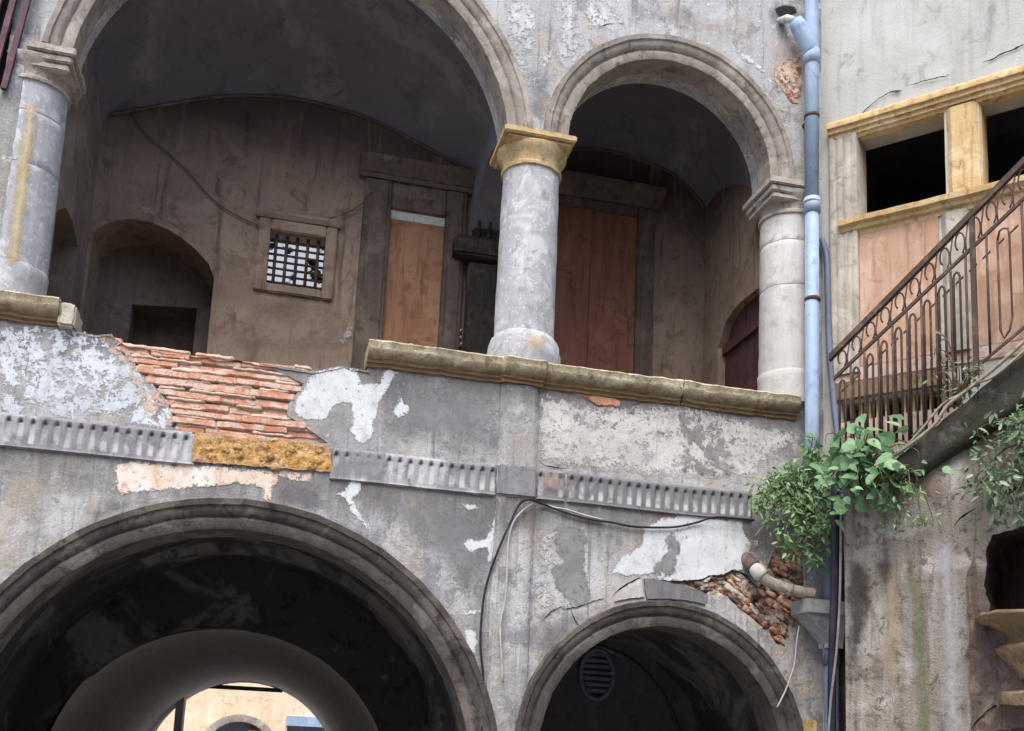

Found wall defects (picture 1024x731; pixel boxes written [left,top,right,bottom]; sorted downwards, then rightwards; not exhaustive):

crack [982,44,1024,63]
flaking render [732,45,802,118]
crack [863,74,950,113]
flaking render [0,323,409,443]
peeling [113,460,312,502]
peeling [334,481,370,529]
crack [542,570,749,625]
peeling [613,515,811,706]